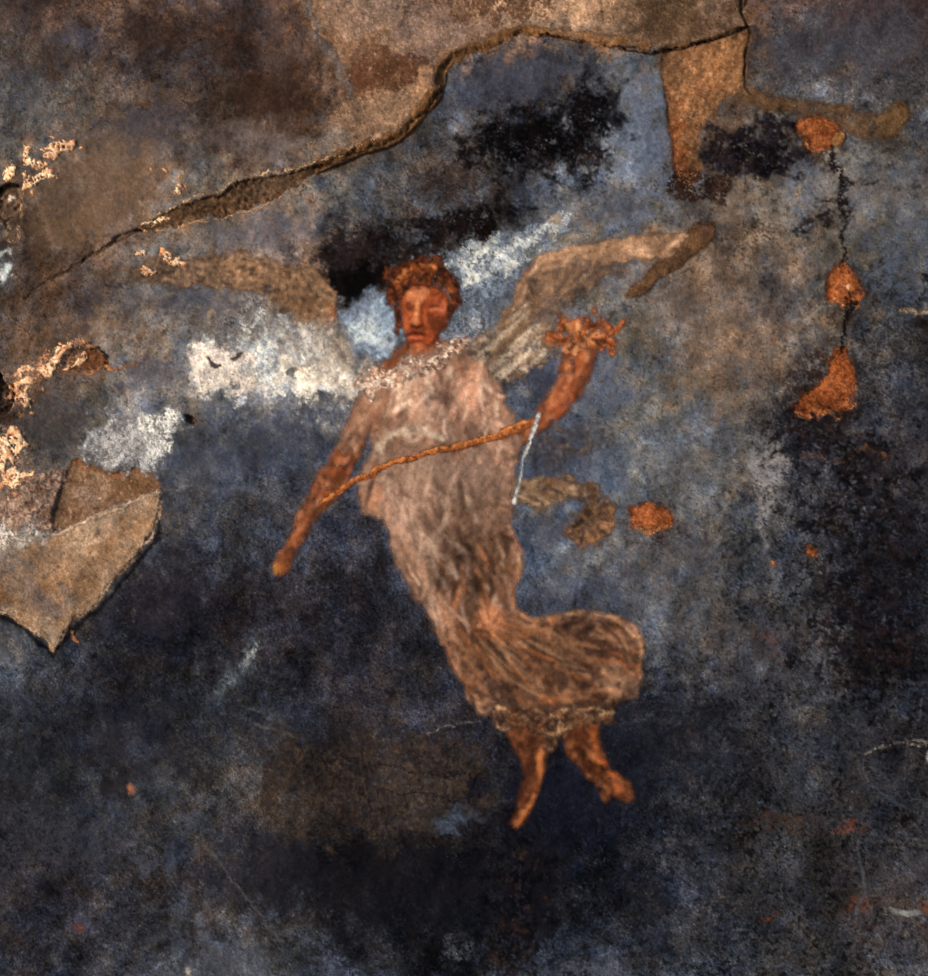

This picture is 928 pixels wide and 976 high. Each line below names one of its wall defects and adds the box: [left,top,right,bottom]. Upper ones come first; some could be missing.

peeling [3,136,83,201]
crack [24,50,497,299]
damp [315,71,628,346]
crack [539,3,753,95]
flaking render [0,337,162,658]